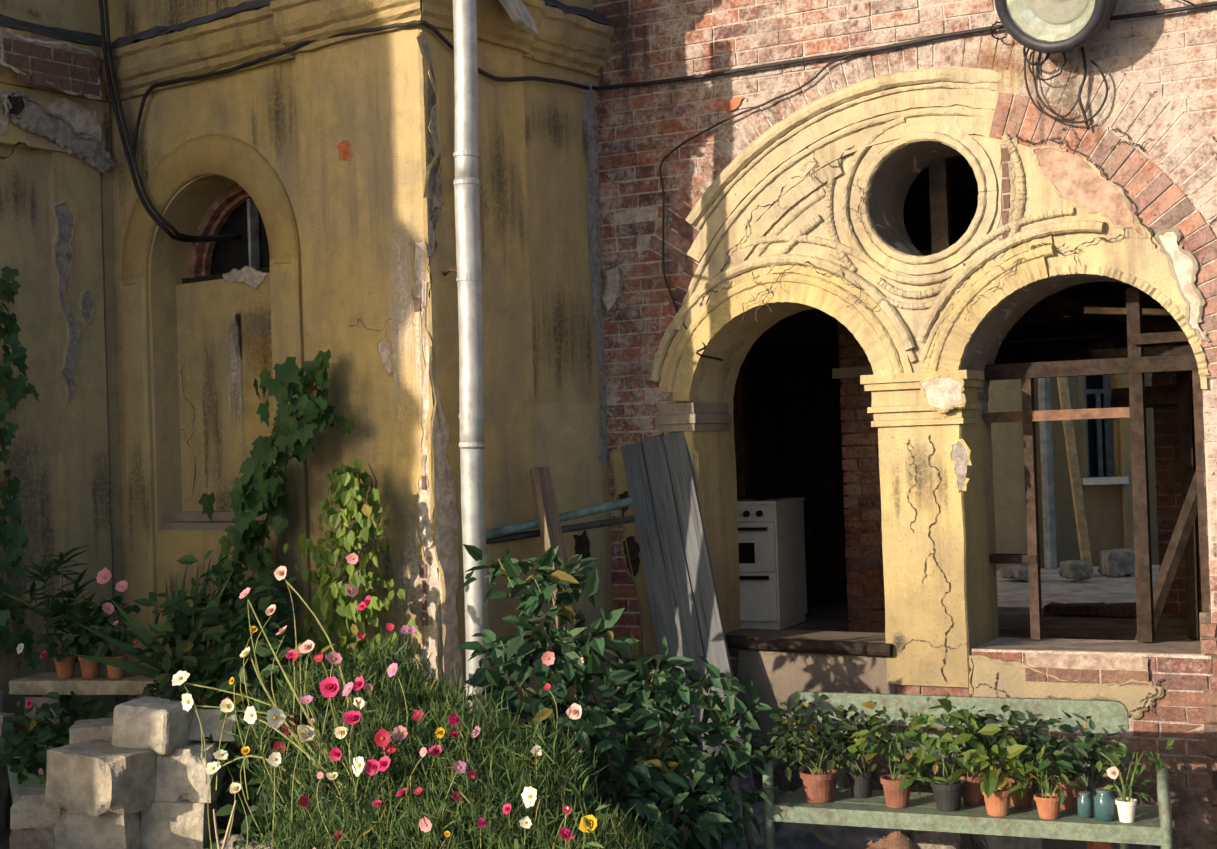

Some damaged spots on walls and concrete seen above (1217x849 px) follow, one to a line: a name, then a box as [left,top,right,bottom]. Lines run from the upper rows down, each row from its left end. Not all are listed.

flaking render [0,29,116,174]
flaking render [52,199,97,405]
spalling [410,32,466,692]
crack [699,145,882,322]
flaking render [918,373,966,413]
crack [900,435,1010,697]
flaking render [948,439,972,492]
flaking render [993,138,1210,341]